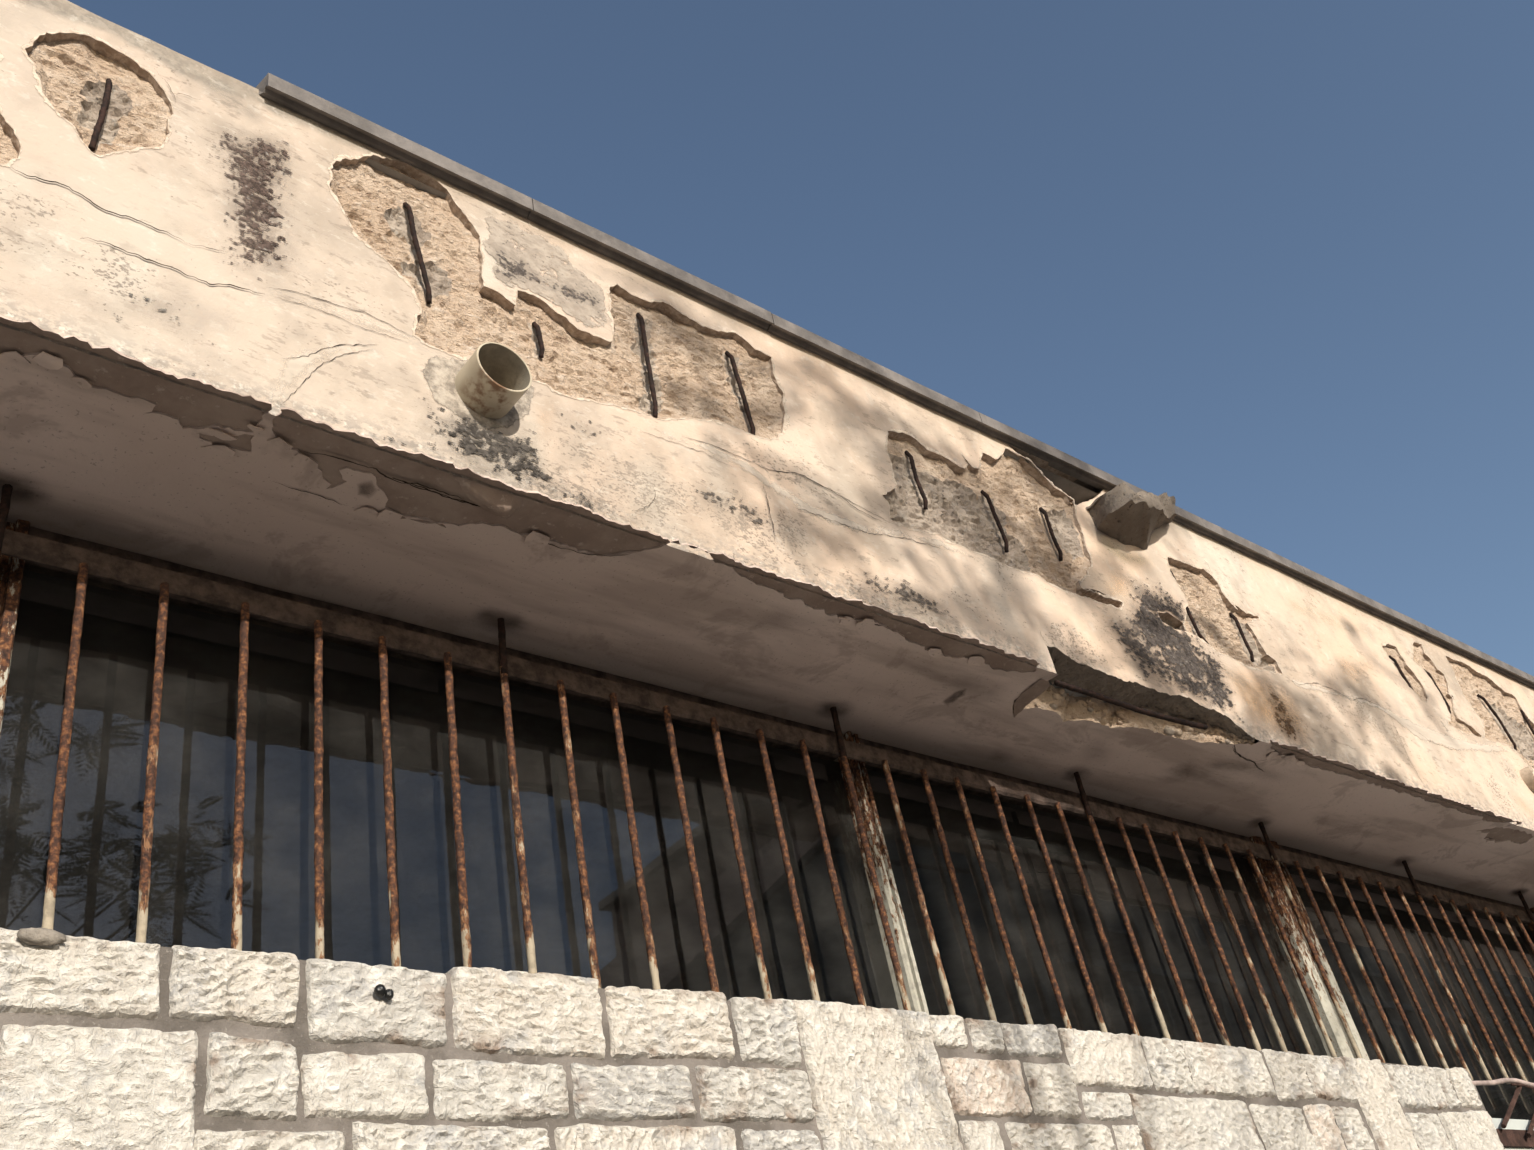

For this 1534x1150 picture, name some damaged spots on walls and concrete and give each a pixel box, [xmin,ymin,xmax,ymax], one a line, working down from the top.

spalling [0,105,22,167]
spalling [0,29,174,157]
damp [213,128,293,279]
spalling [326,152,789,441]
damp [419,397,607,512]
peeling [0,315,1534,844]
damp [1110,578,1243,721]